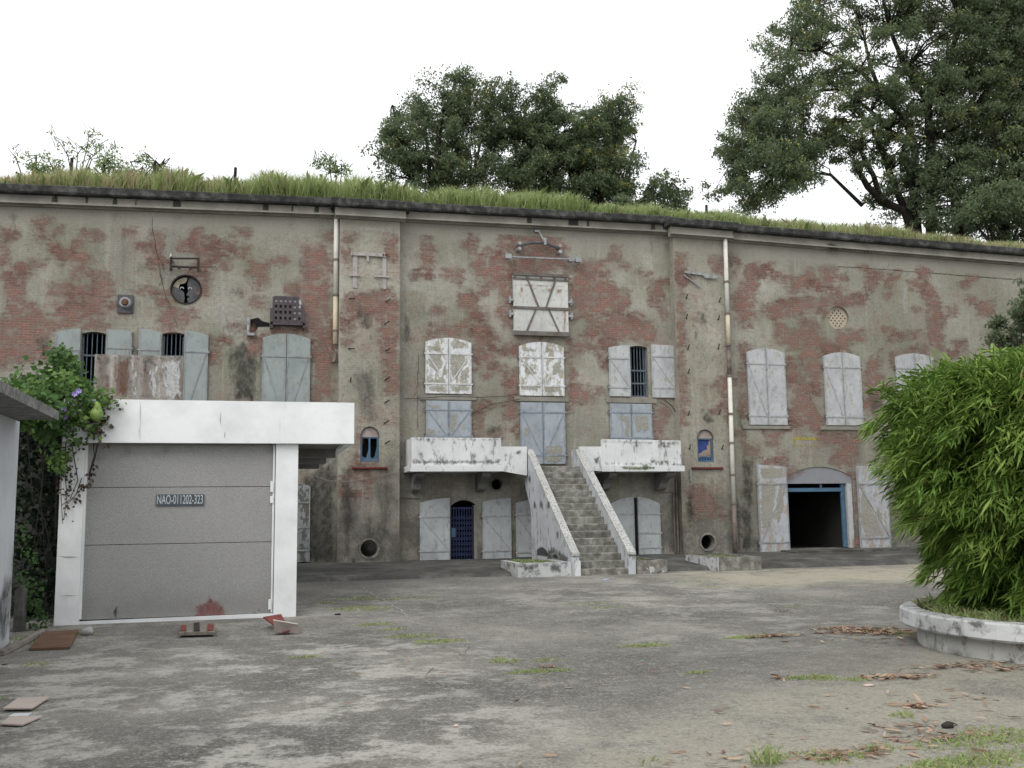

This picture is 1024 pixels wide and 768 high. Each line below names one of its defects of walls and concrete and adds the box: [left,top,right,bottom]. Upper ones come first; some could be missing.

flaking render [0,218,117,366]
water stain [230,344,256,398]
flaking render [123,228,400,402]
flaking render [413,233,691,439]
flaking render [708,243,965,528]